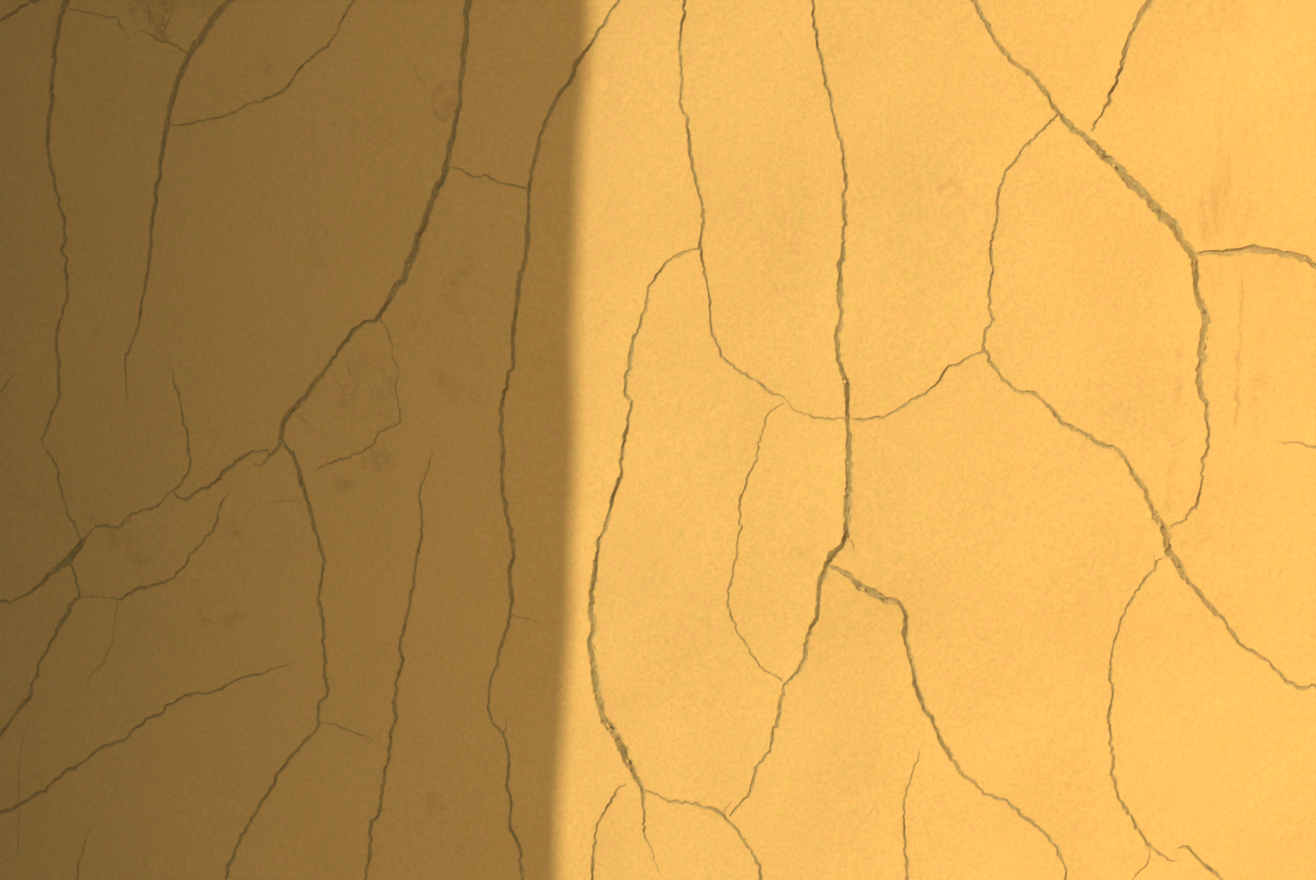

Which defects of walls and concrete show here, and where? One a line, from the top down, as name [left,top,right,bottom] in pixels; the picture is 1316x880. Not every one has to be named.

crack [0,0,622,880]
crack [586,0,1316,880]